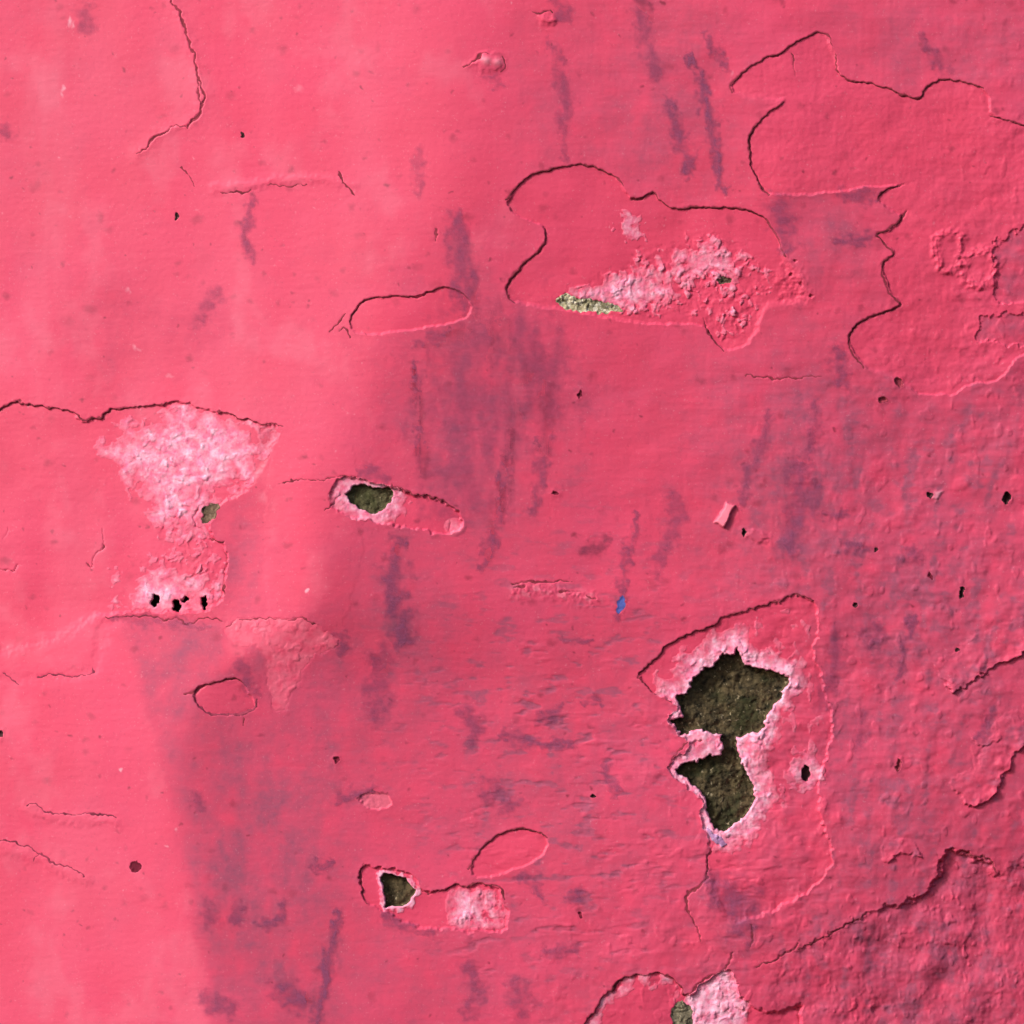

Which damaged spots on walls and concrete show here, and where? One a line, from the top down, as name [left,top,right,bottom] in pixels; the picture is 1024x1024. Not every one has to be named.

crack [136,0,206,154]
peeling [505,163,802,352]
crack [745,373,822,381]
peeling [0,399,339,711]
spalling [283,475,467,537]
spalling [637,593,834,921]
spalling [358,827,548,934]
crack [684,859,709,942]
crack [686,924,799,995]
spalling [584,850,1024,1024]